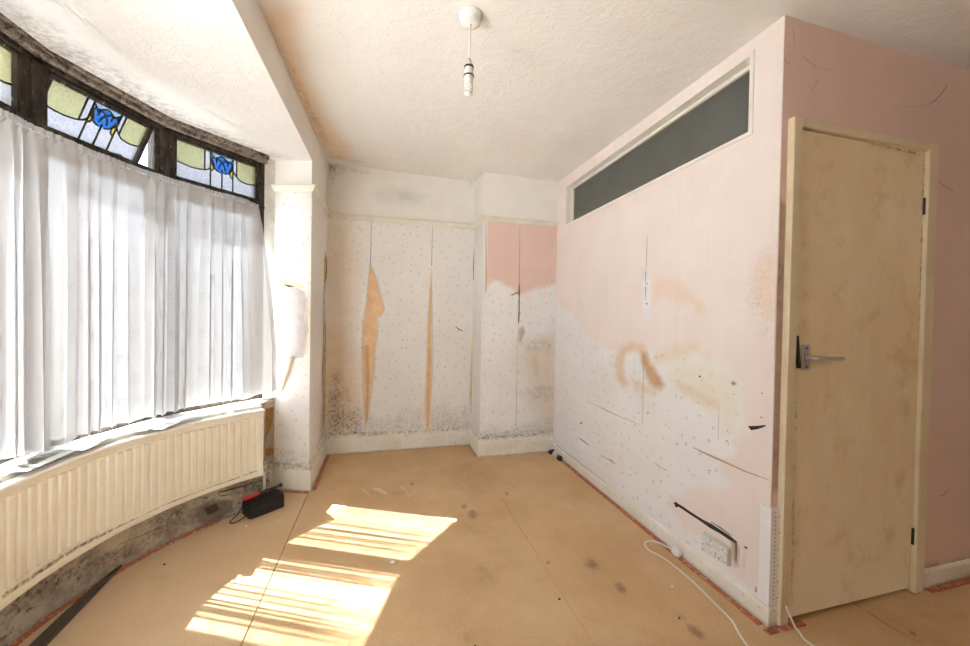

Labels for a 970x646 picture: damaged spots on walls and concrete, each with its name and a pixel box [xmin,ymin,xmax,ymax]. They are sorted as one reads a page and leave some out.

damp [0,0,555,646]
peeling [480,272,762,598]
damp [611,188,787,504]